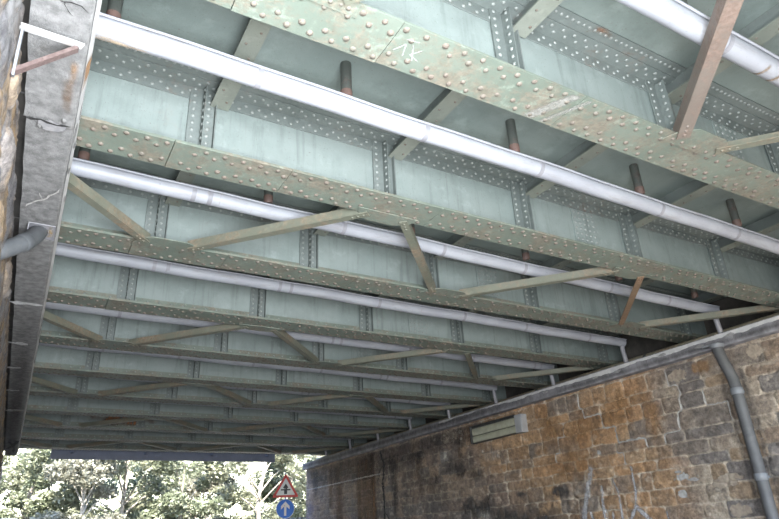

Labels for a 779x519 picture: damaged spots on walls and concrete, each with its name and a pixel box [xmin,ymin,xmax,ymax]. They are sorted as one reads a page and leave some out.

crack [26,189,60,206]
peeling [18,0,102,451]
crack [377,452,389,519]
leakage [552,487,567,496]
leakage [464,498,549,519]